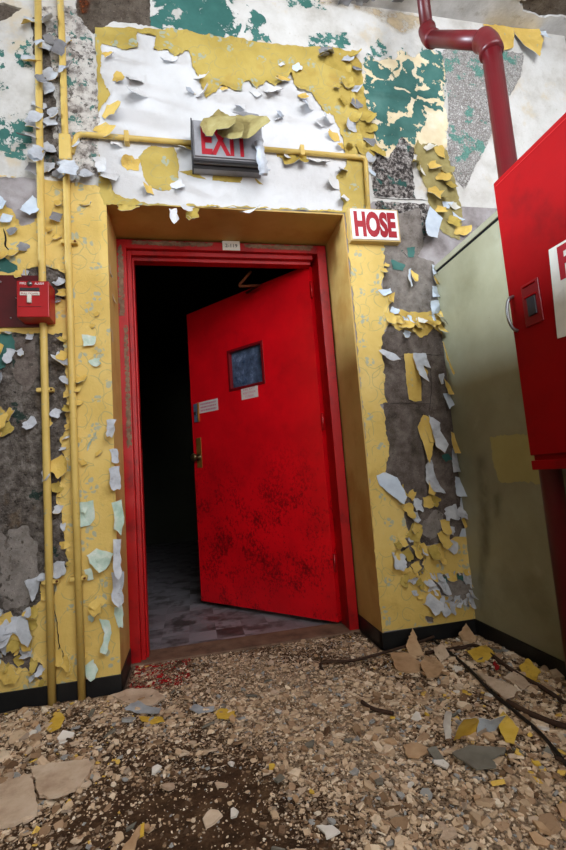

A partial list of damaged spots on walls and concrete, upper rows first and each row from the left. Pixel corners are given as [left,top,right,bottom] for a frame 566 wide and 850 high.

peeling [286,0,327,10]
spalling [520,0,566,15]
peeling [249,62,303,97]
peeling [200,102,284,139]
peeling [308,32,492,239]
peeling [265,154,330,171]
peeling [378,264,455,409]
peeling [0,242,132,687]
peeling [377,432,479,618]